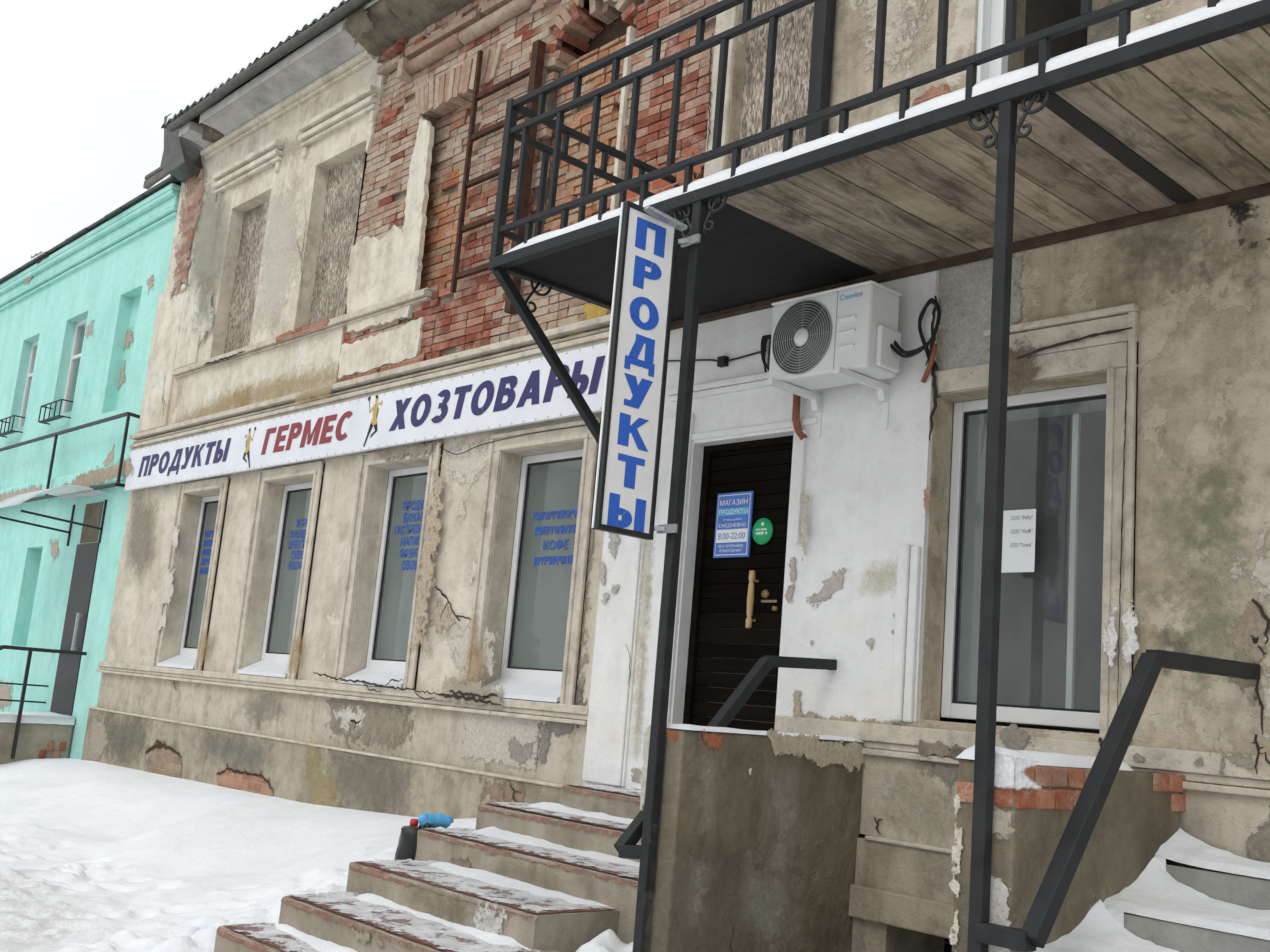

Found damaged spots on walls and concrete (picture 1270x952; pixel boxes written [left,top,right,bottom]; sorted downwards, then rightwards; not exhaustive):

flaking render [626,148,704,202]
crack [435,586,471,621]
flaking render [1224,527,1270,741]
crack [1251,599,1270,774]
flaking render [144,747,182,778]
flaking render [217,770,273,797]
flaking render [325,695,415,751]
flaking render [767,728,866,772]
peeling [793,690,966,761]
flaking render [992,766,1091,839]
flaking render [948,782,974,952]
flaking render [989,875,1012,926]